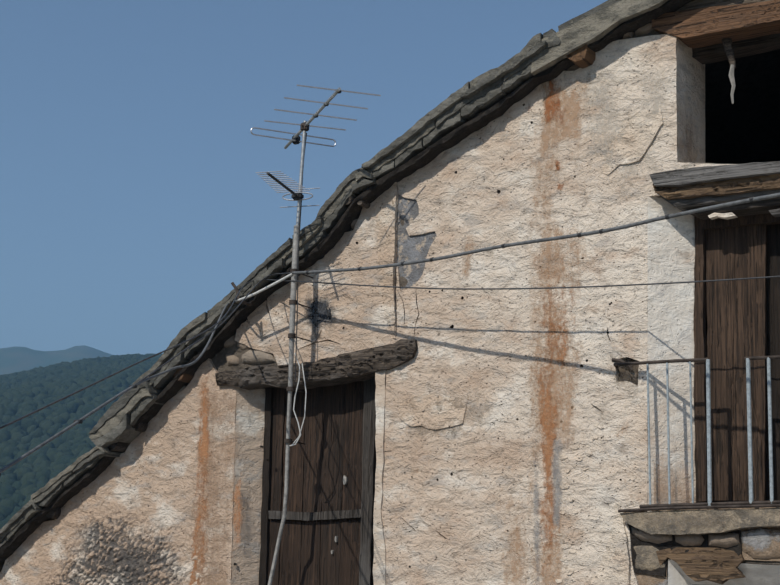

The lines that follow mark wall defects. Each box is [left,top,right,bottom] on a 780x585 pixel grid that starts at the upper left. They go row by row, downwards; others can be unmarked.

rust [542,81,587,170]
peeling [375,182,437,338]
rust [197,388,209,484]
rust [531,227,577,585]
mould [5,486,212,585]
rust [190,499,206,585]
spalling [584,501,780,585]